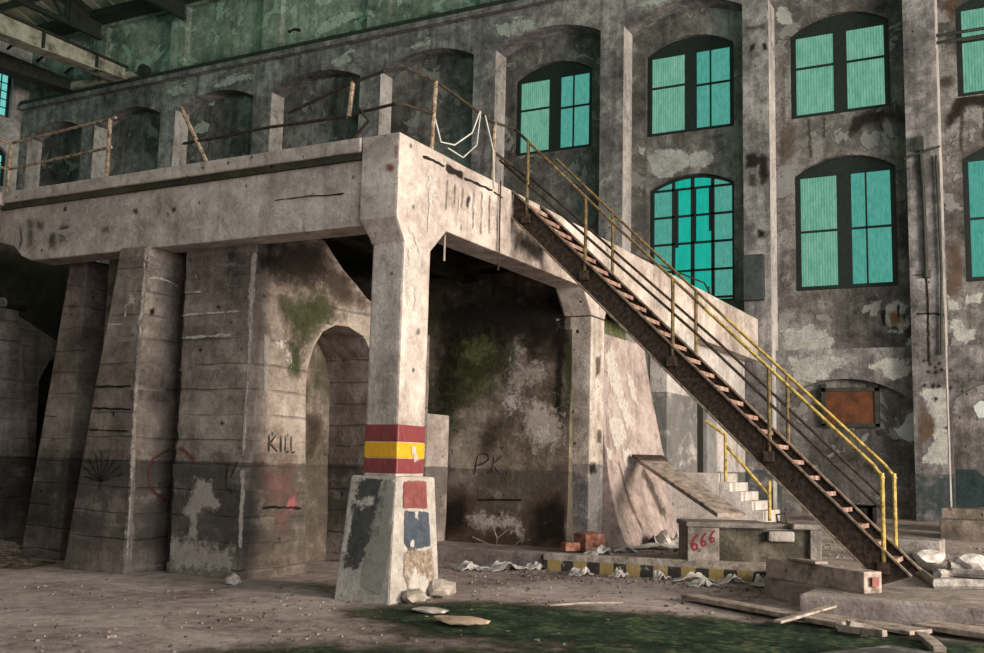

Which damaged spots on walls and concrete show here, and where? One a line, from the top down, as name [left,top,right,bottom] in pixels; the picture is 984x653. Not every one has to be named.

peeling [314,0,364,38]
peeling [495,16,535,37]
water stain [183,241,360,456]
water stain [436,287,570,454]
peeling [780,324,847,383]
peeling [868,301,912,381]
peeling [973,401,984,418]
peeling [170,477,236,572]